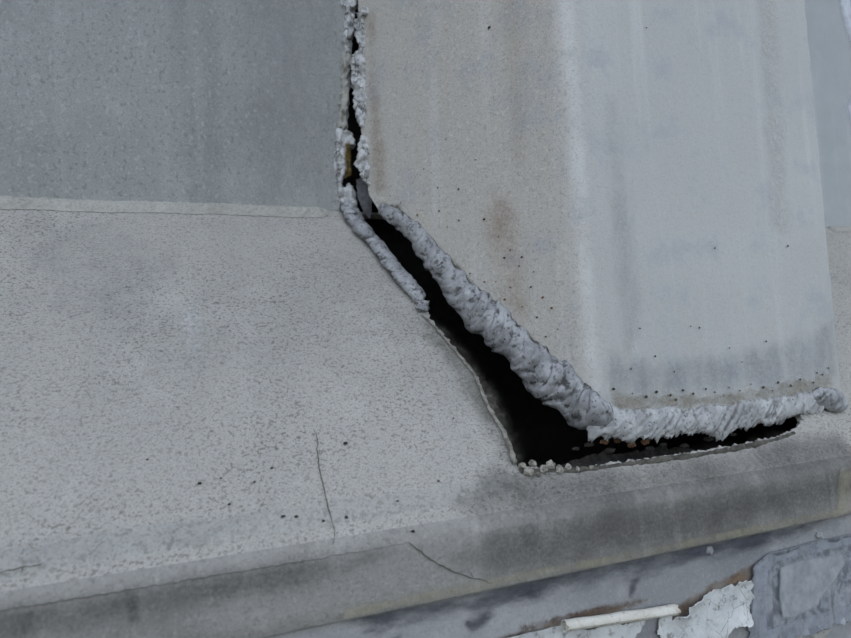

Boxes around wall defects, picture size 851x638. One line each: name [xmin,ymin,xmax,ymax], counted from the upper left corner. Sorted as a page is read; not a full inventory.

crack [333,0,377,219]
crack [412,296,796,477]
crack [0,431,492,612]
peeling [509,580,755,638]